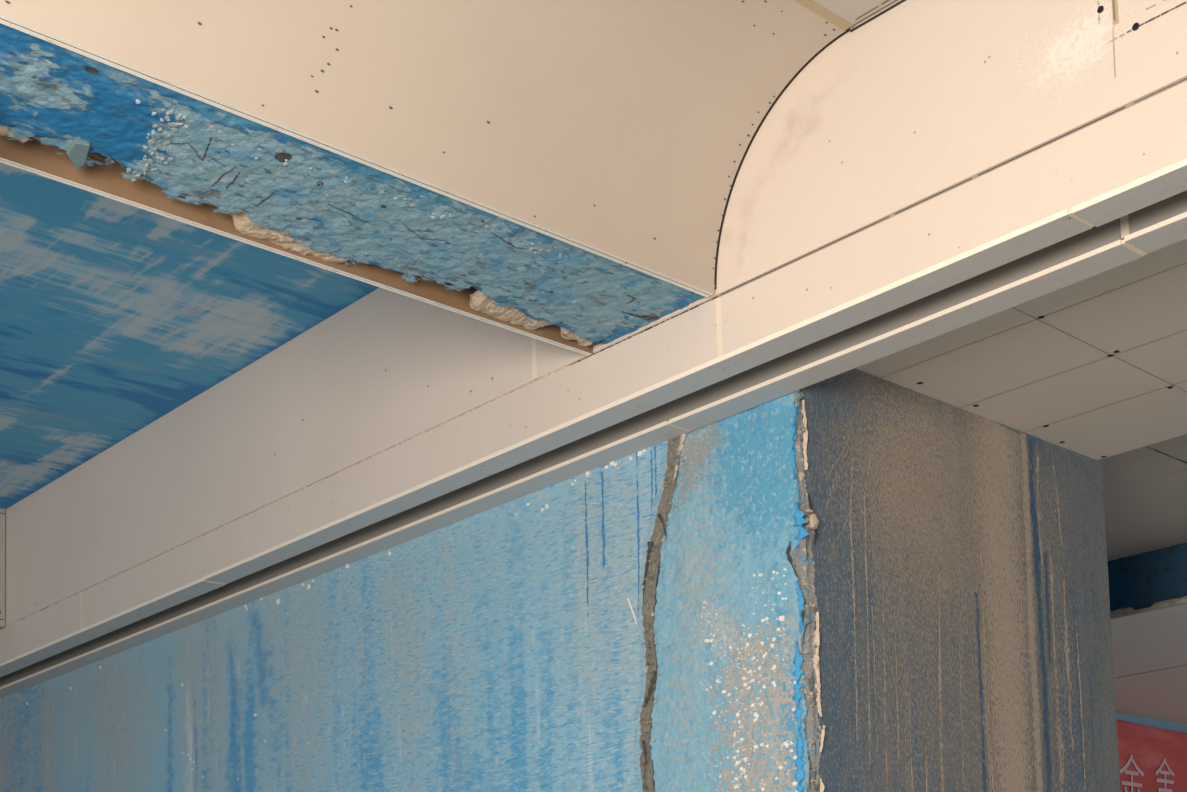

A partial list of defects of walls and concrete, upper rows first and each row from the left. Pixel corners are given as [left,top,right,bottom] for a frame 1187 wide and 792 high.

peeling [0,43,699,340]
crack [635,434,686,792]
peeling [692,388,826,792]